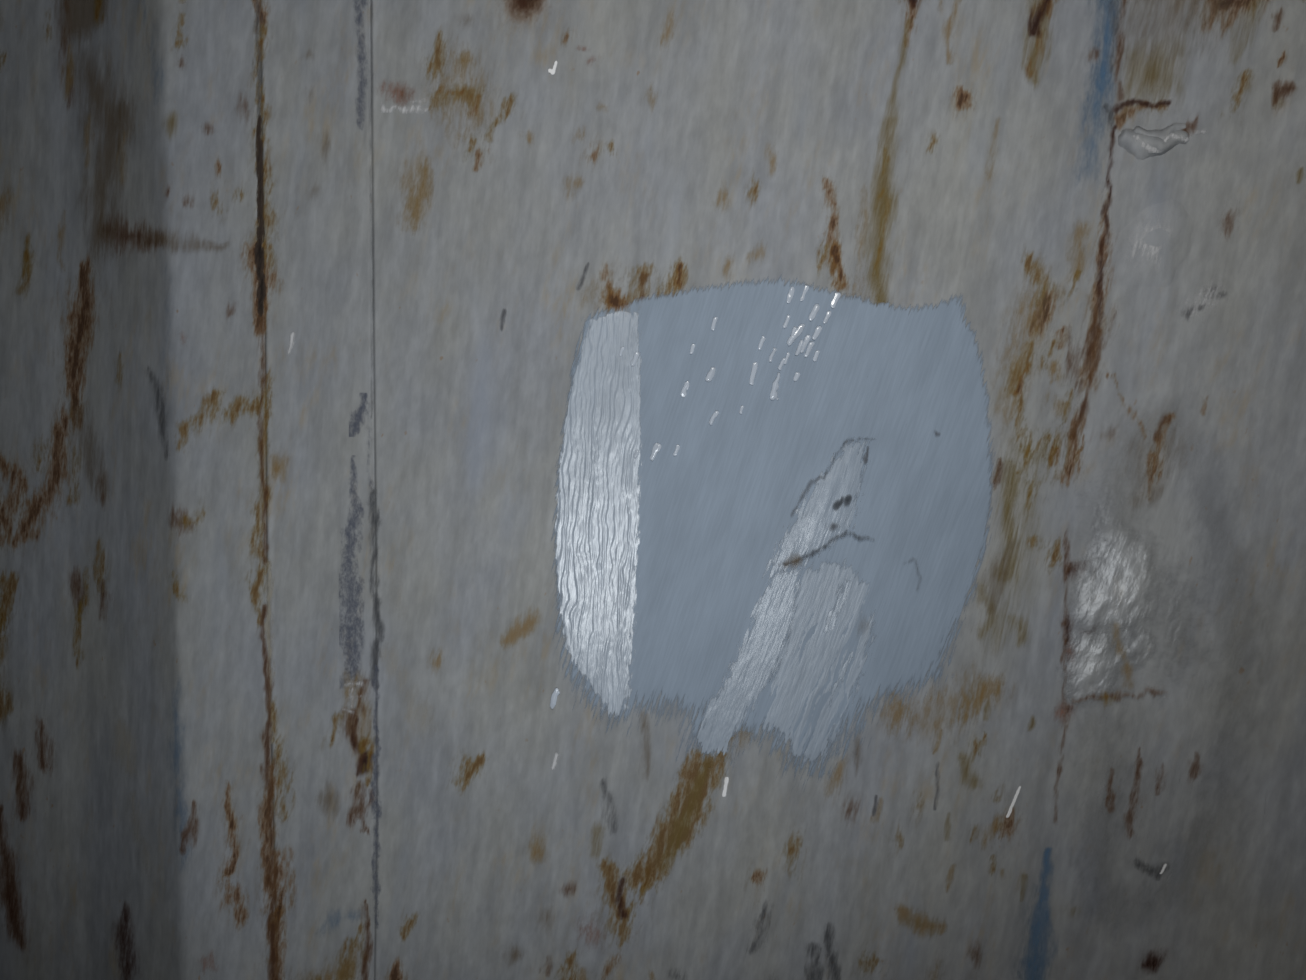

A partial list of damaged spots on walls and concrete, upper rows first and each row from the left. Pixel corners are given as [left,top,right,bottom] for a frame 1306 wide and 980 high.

corrosion [1205,0,1256,28]
corrosion [873,119,893,306]
crack [1061,40,1171,481]
corrosion [0,259,95,546]
peeling [832,495,852,529]
corrosion [1064,616,1096,661]
corrosion [601,751,726,946]
corrosion [389,961,403,980]